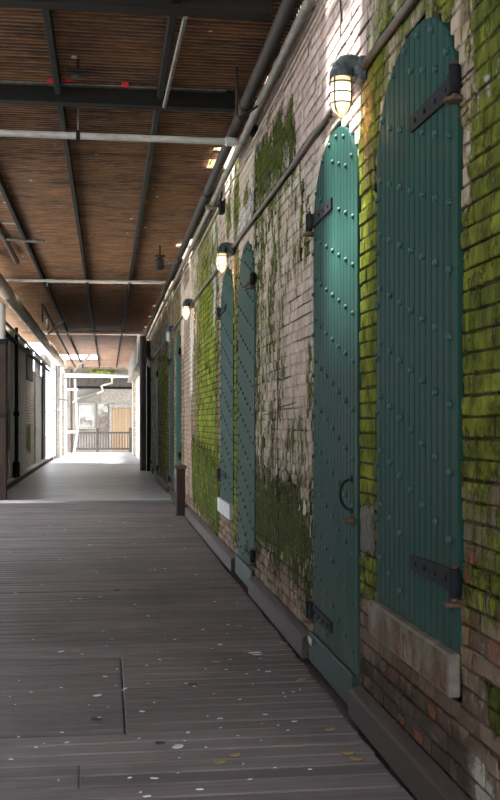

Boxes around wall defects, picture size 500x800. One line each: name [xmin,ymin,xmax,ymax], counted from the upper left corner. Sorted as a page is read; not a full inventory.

peeling [255,176,314,515]